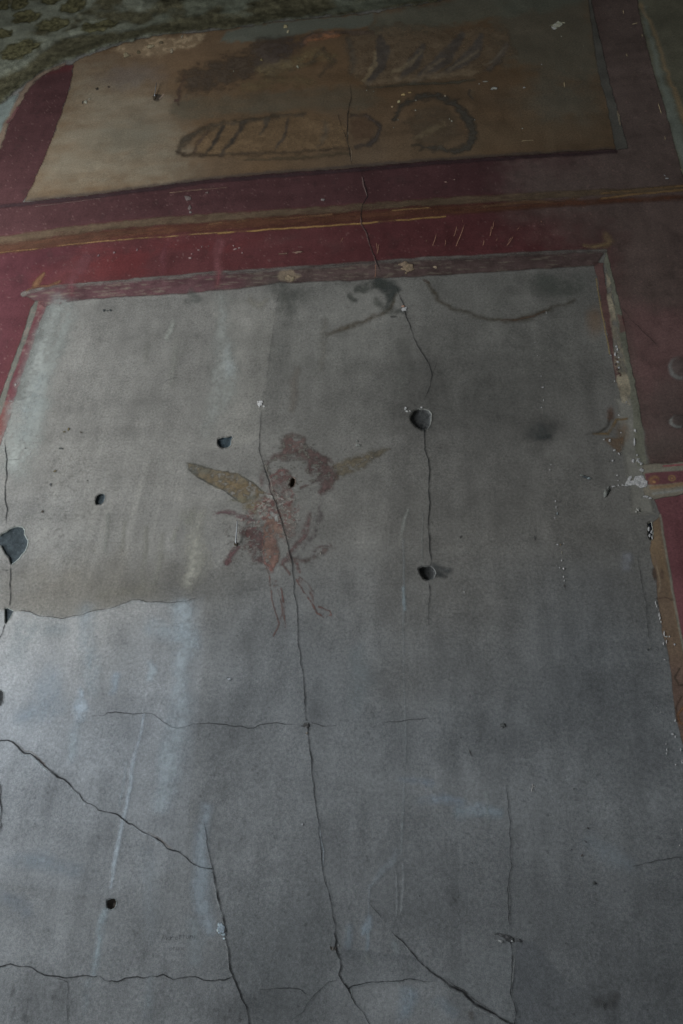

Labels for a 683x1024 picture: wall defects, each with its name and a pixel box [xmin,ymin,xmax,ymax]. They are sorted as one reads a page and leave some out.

crack [0,740,250,1024]
crack [201,419,517,1024]